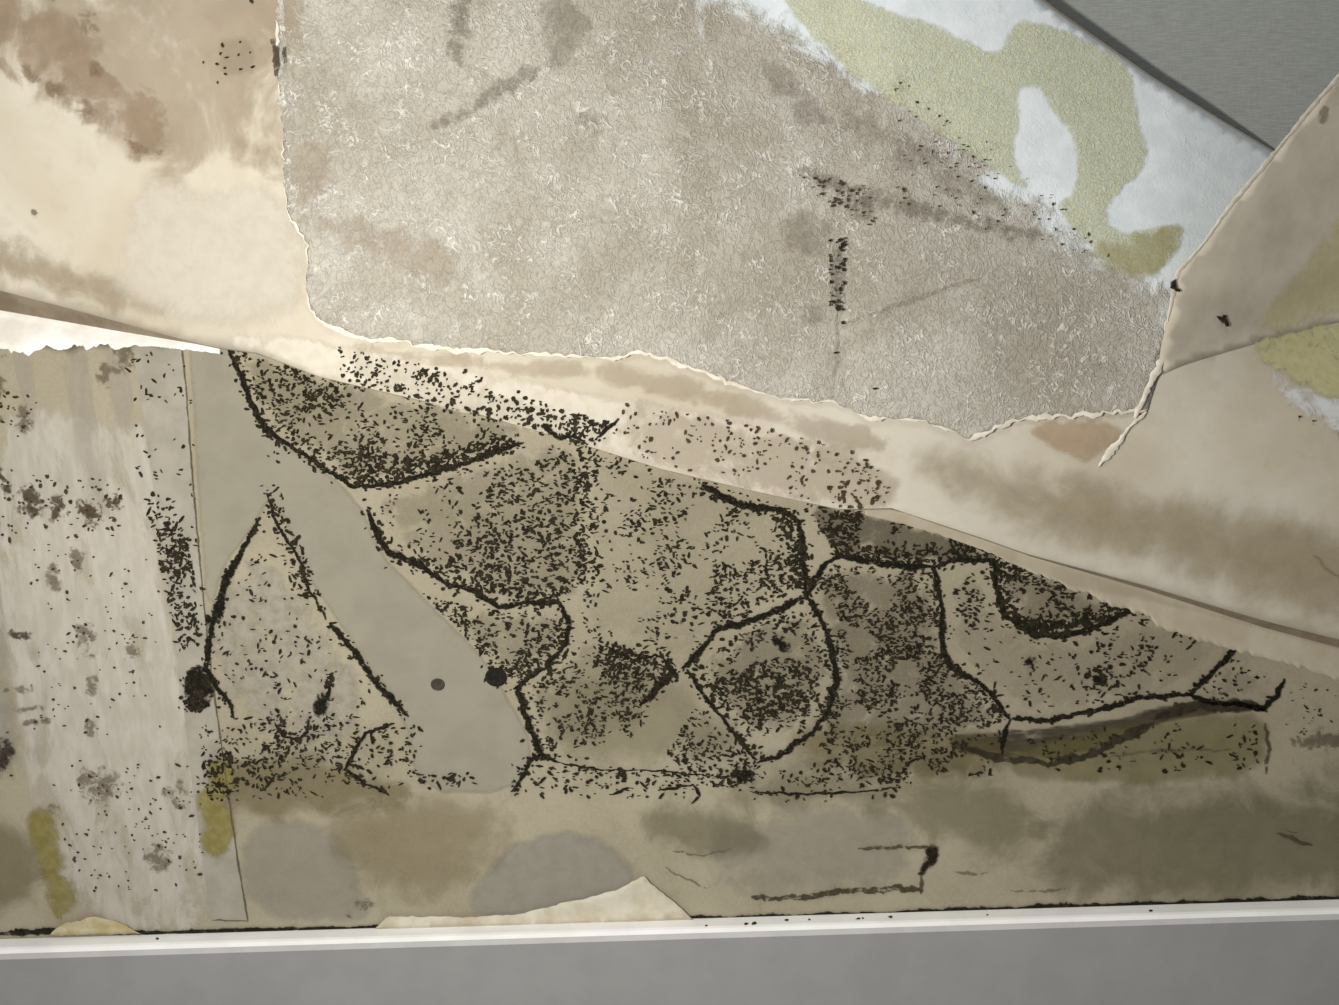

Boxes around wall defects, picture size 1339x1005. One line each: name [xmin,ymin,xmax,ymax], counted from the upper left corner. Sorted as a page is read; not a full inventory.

water stain [0,0,292,163]
water stain [0,377,36,437]
water stain [95,347,152,382]
water stain [0,468,122,610]
water stain [3,569,156,736]
water stain [28,424,477,917]
crack [178,350,1285,804]
water stain [237,347,1272,799]
water stain [988,484,1339,606]
water stain [0,732,15,777]